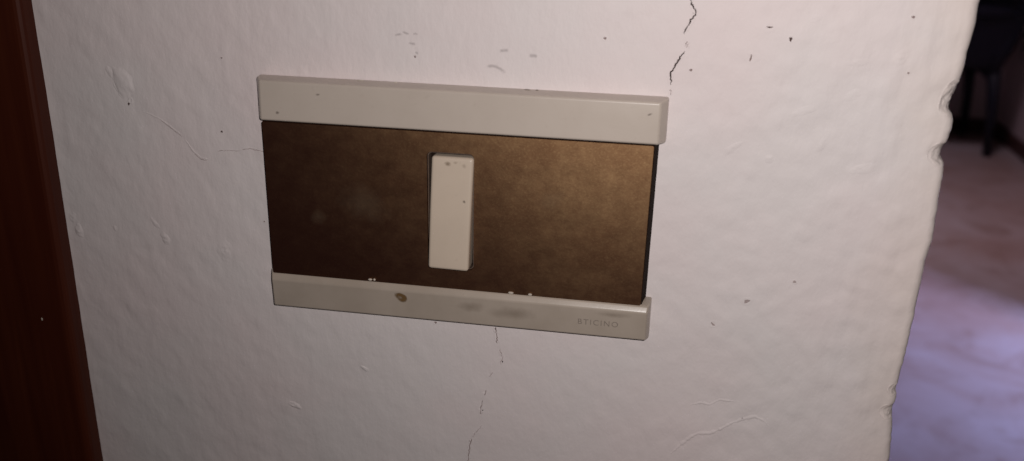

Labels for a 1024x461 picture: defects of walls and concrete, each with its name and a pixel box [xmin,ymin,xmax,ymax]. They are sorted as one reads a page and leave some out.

crack [667,0,699,95]